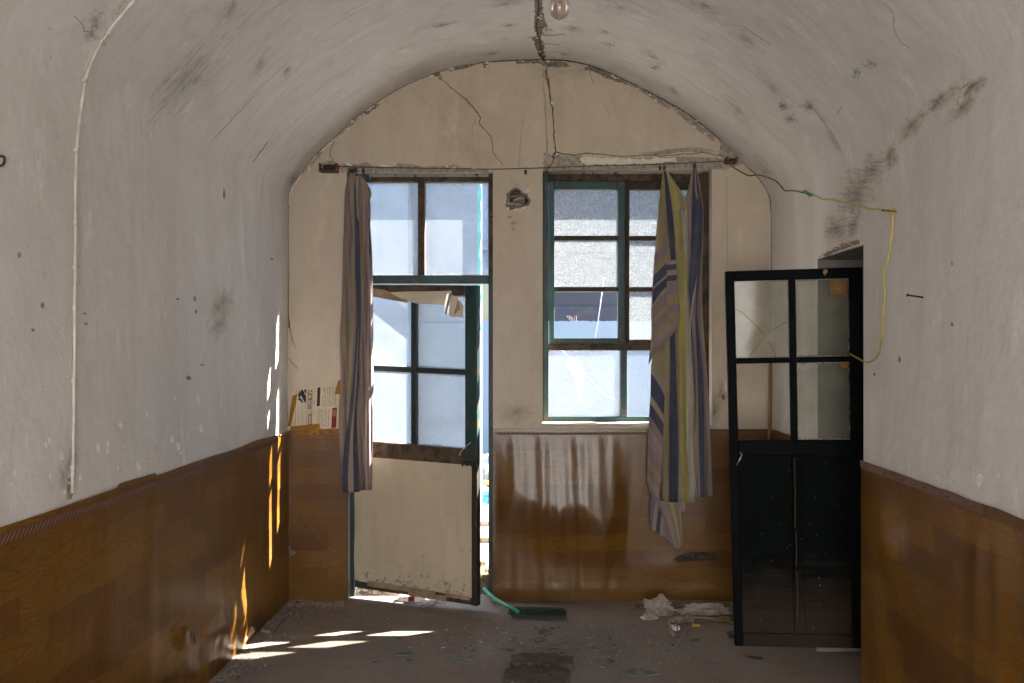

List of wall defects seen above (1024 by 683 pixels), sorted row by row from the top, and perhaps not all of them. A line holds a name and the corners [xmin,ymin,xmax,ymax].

spalling [543,65,748,171]
spalling [504,175,539,212]
crack [288,0,772,369]